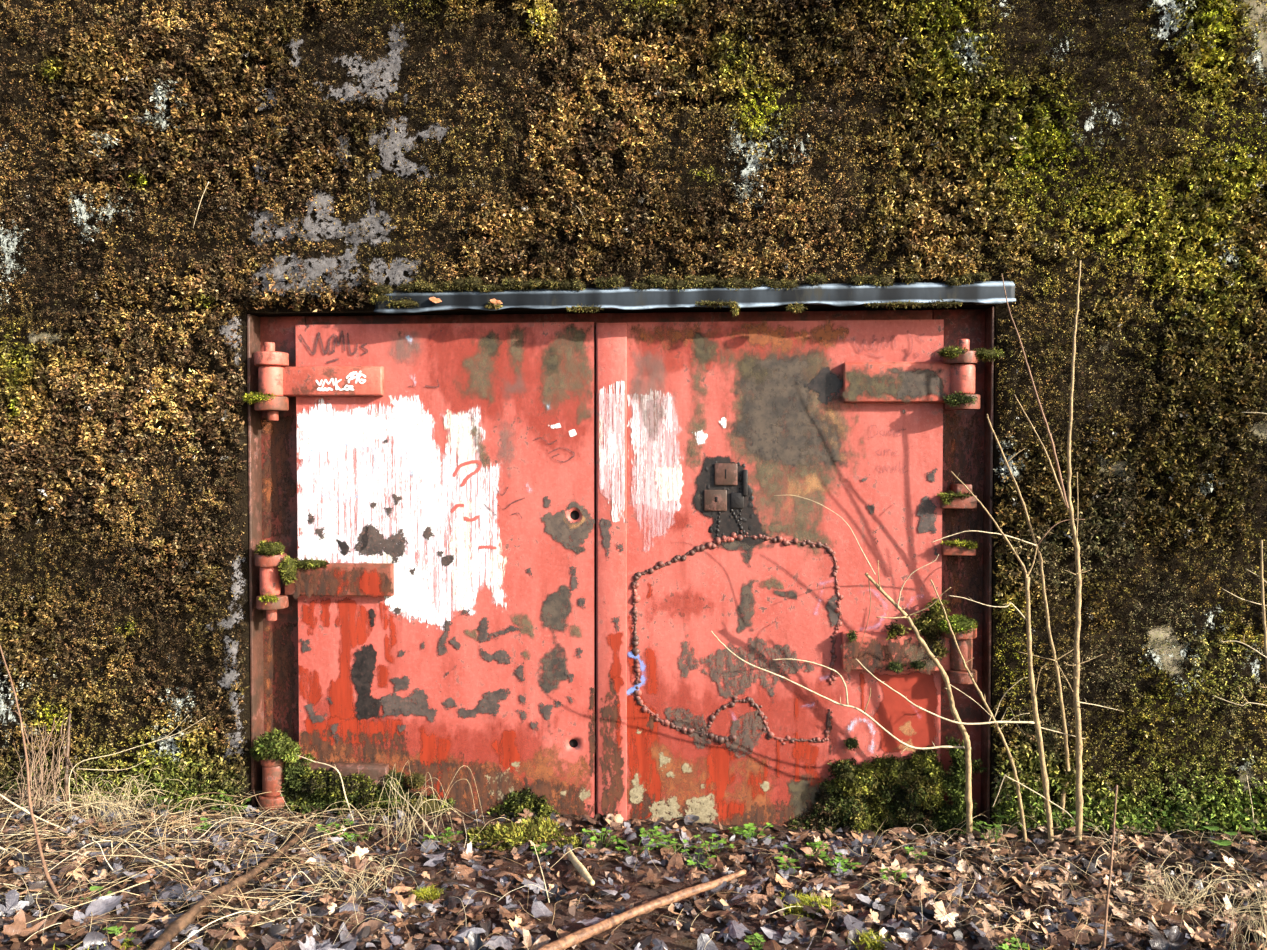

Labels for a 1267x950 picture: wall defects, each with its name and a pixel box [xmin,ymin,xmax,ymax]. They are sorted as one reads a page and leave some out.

peeling [248,21,448,299]
rust [261,416,296,543]
peeling [308,512,415,575]
peeling [369,493,402,517]
peeling [423,526,455,566]
peeling [351,609,574,741]
rust [263,565,831,827]
peeling [664,635,816,761]